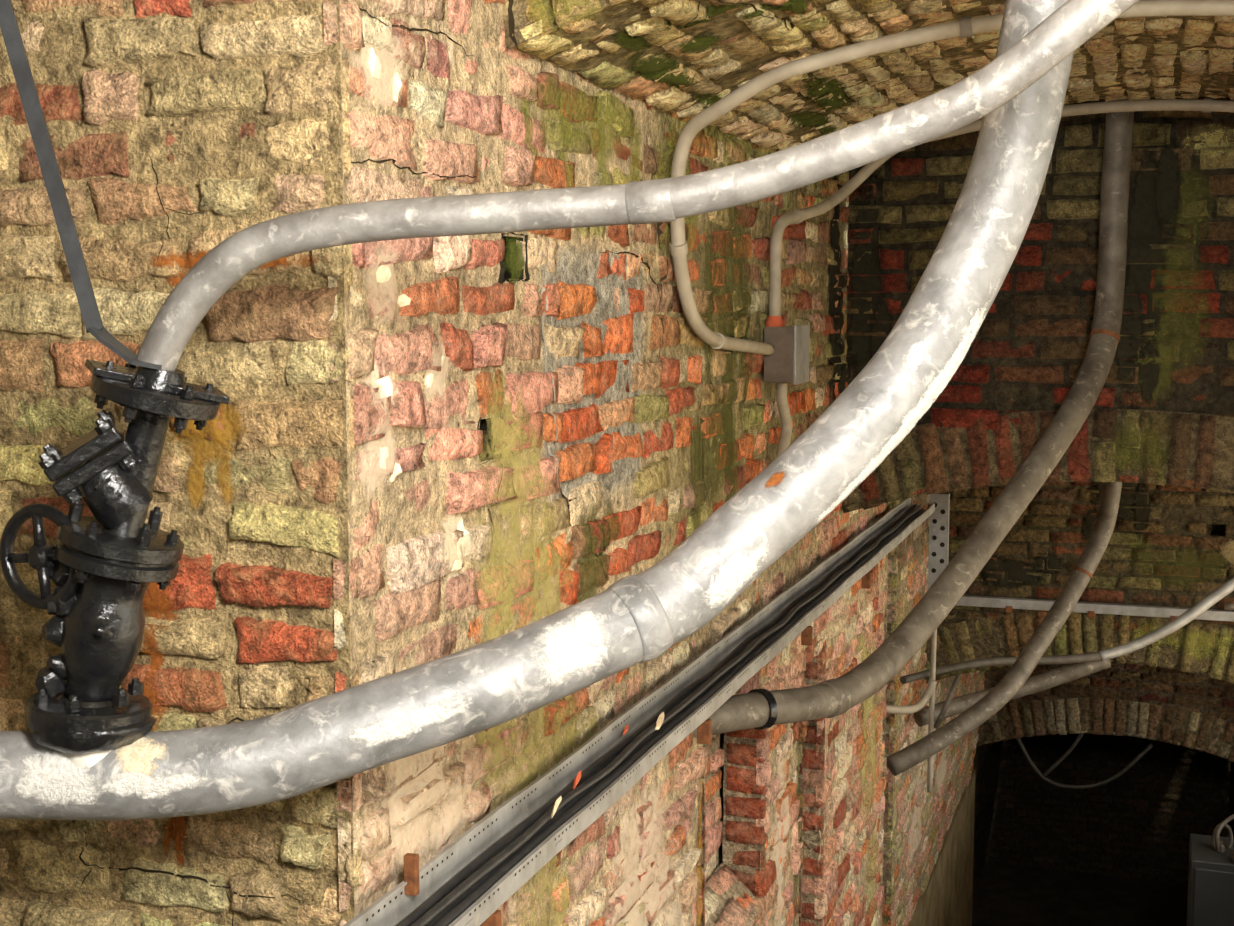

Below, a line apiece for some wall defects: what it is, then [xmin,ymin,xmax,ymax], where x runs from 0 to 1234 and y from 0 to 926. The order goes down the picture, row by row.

crack [359,3,474,56]
crack [508,0,518,49]
corrosion [171,404,240,507]
crack [79,837,301,926]